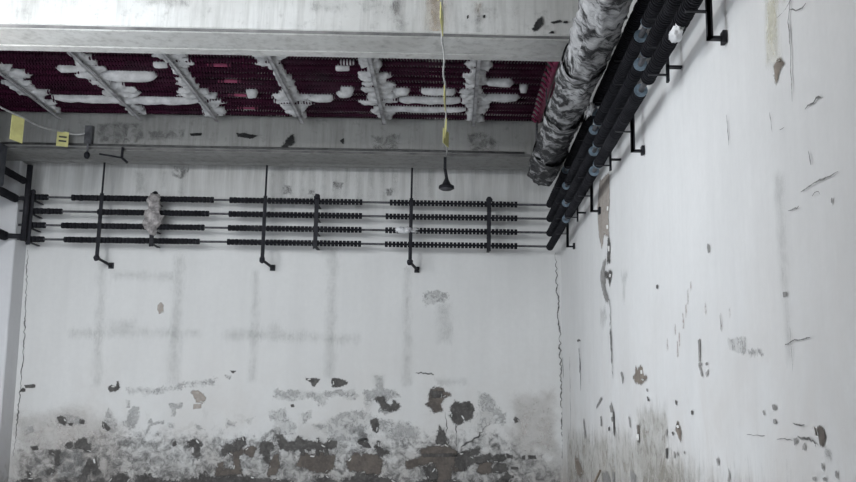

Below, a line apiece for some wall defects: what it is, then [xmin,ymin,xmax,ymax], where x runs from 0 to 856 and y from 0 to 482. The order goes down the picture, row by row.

peeling [774,58,784,84]
peeling [597,174,612,302]
water stain [26,434,319,482]
peeling [16,378,414,482]
peeling [405,425,536,482]
peeling [425,387,520,425]
peeling [621,366,649,401]
peeling [665,422,685,458]
peeling [812,425,838,481]